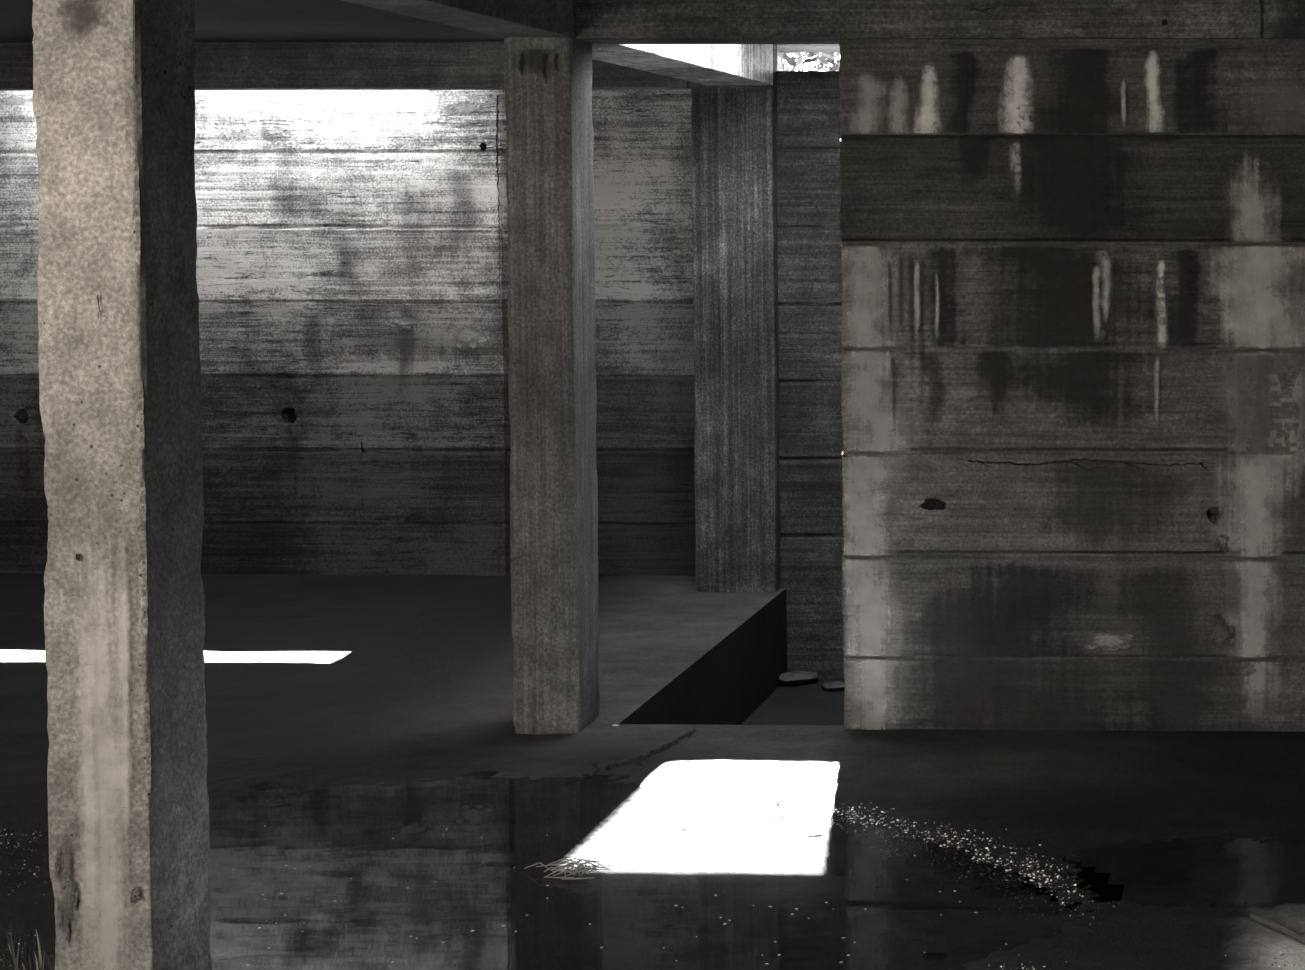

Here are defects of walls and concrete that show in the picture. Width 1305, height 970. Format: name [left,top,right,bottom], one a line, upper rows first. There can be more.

water stain [857,53,987,176]
water stain [977,48,1198,423]
water stain [842,246,964,730]